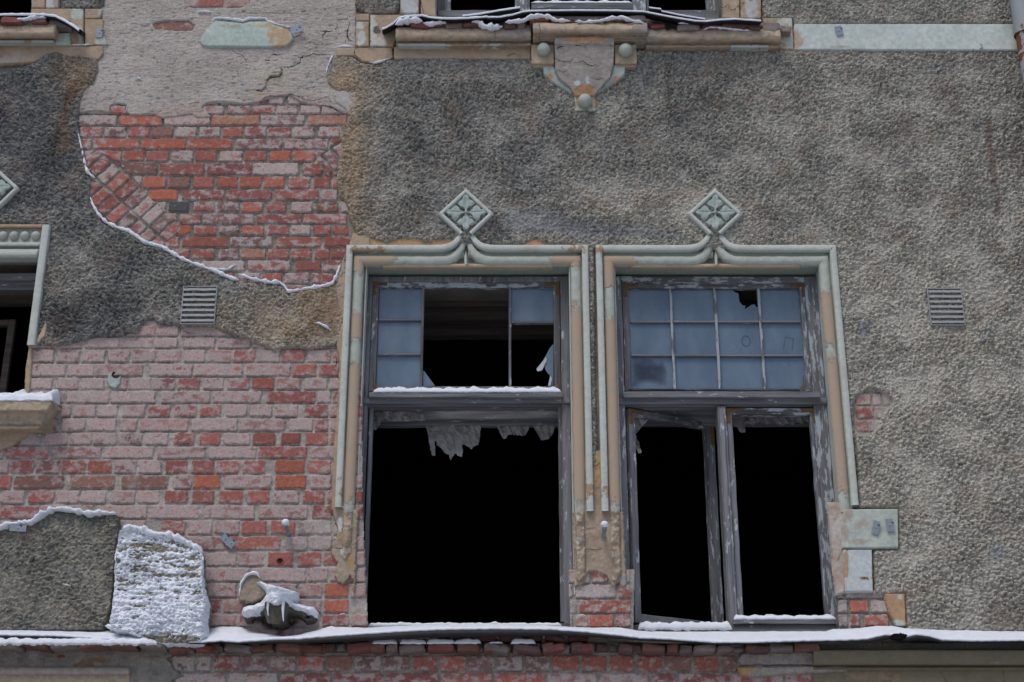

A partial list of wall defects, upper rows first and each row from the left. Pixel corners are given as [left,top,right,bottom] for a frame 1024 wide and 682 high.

spalling [153,21,195,31]
crack [233,1,424,115]
spalling [79,96,581,295]
spalling [0,309,368,636]
peeling [821,290,893,499]
spalling [837,589,902,629]